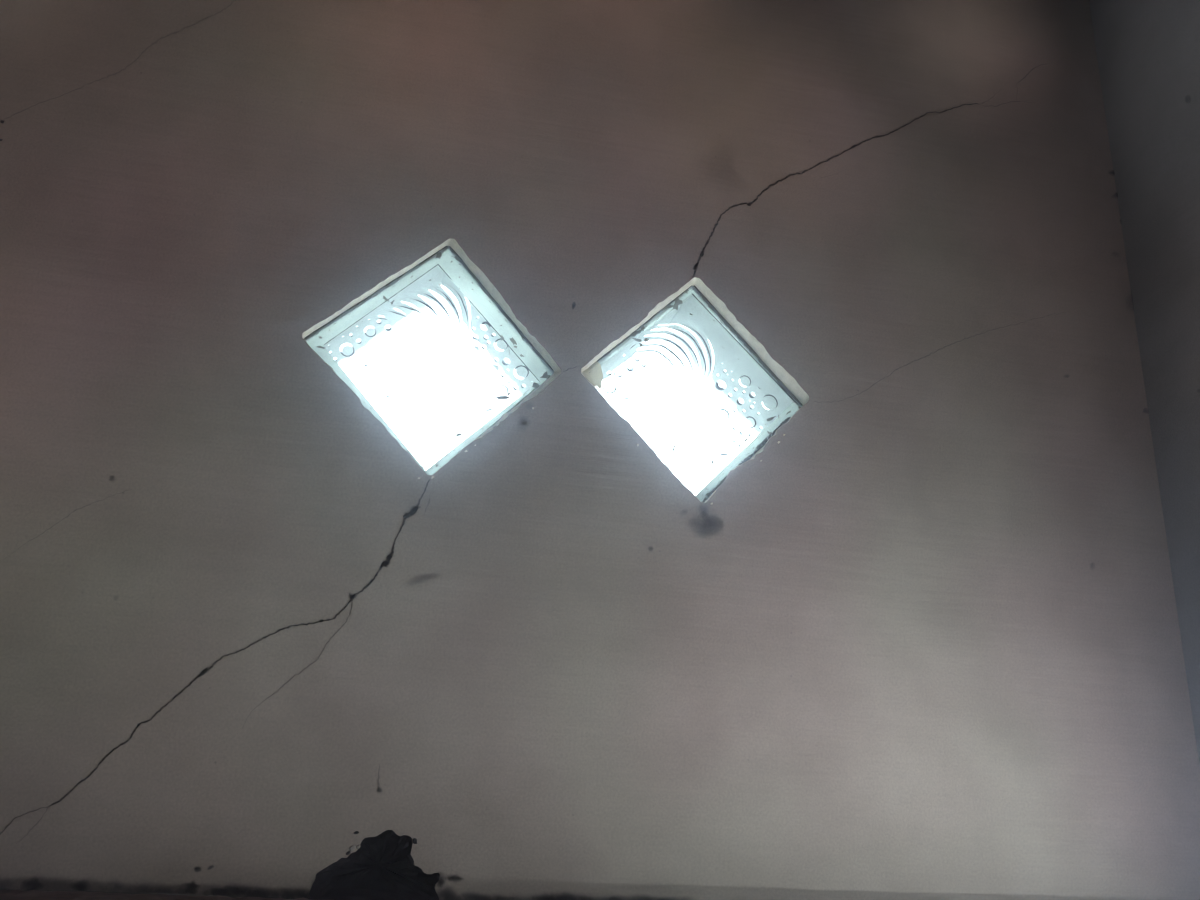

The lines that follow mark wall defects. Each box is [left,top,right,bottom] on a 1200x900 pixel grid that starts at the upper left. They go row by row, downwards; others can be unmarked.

crack [693,63,1047,277]
crack [0,481,429,835]
spalling [310,830,460,900]